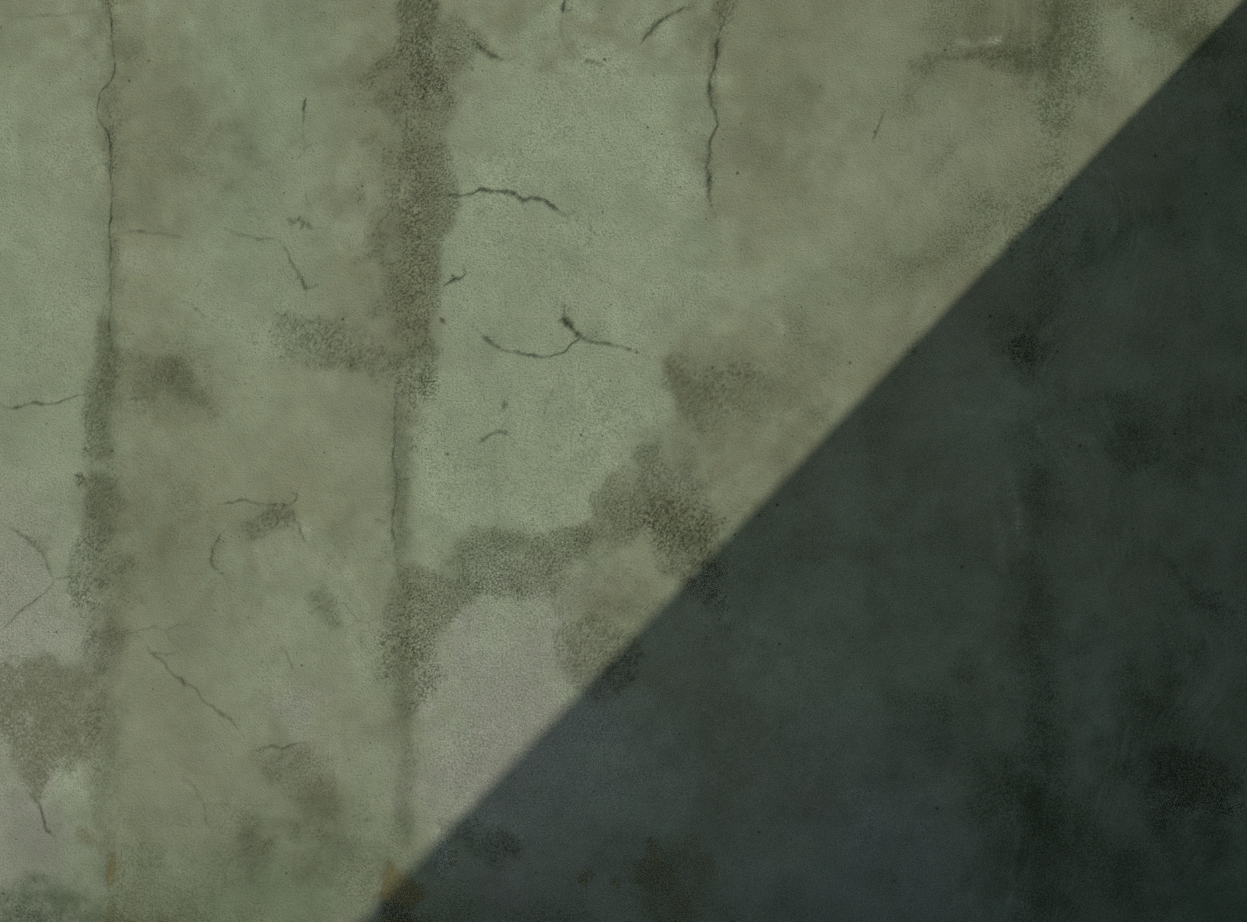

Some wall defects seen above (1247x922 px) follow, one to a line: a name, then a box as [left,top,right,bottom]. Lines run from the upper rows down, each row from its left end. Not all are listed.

water stain [391,122,454,395]
crack [447,188,557,209]
crack [486,317,576,356]
water stain [610,471,723,594]
water stain [391,575,468,685]
water stain [0,663,86,788]